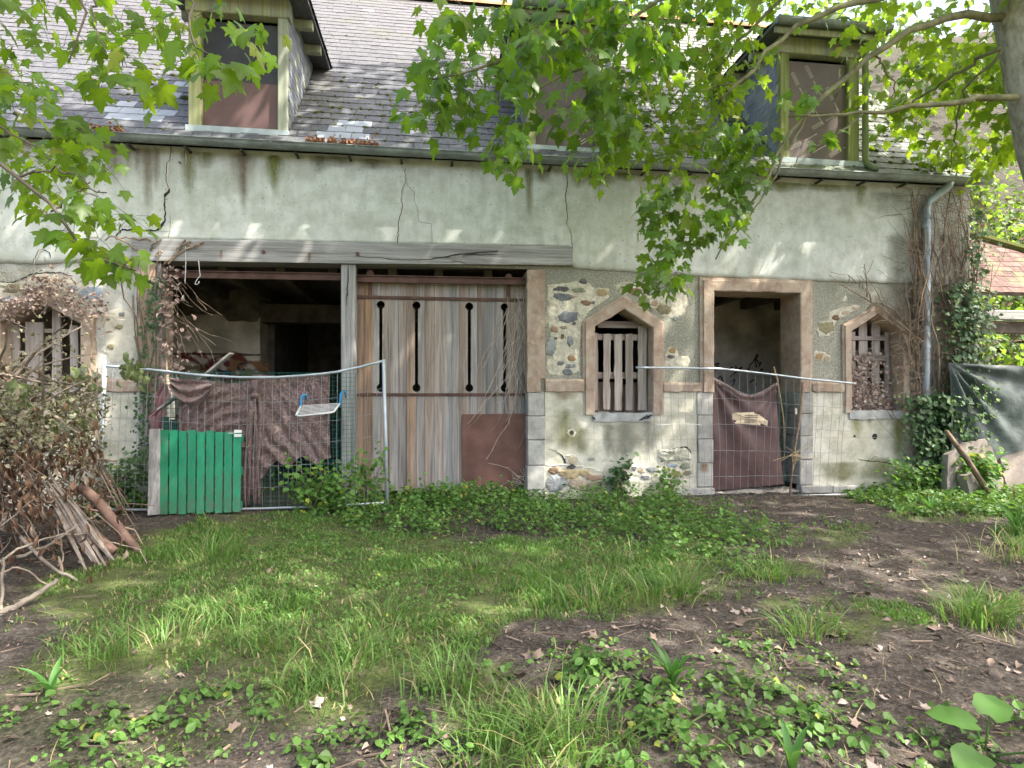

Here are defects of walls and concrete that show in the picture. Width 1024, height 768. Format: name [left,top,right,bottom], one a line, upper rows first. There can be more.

crack [116,147,327,253]
leakage [268,156,280,175]
crack [346,165,504,305]
crack [565,174,574,245]
flaking render [545,278,690,376]
spalling [816,305,861,337]
spalling [544,453,694,496]